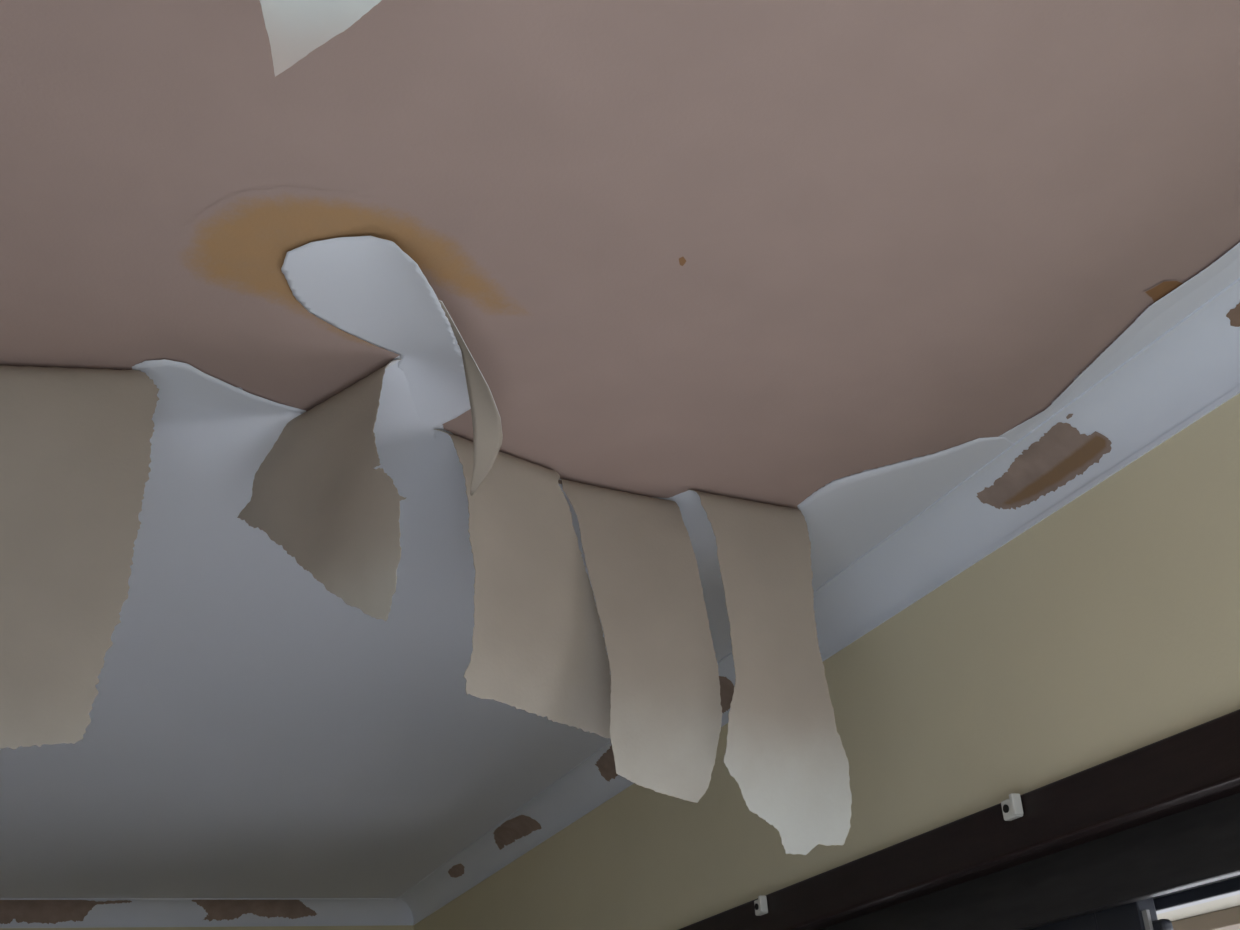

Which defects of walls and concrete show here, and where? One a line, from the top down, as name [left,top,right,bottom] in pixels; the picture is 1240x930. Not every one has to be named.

water stain [171,185,545,355]
peeling [0,0,1240,738]
peeling [559,478,722,803]
peeling [690,490,852,855]
peeling [0,900,132,924]
peeling [192,900,317,921]
peeling [493,815,541,850]